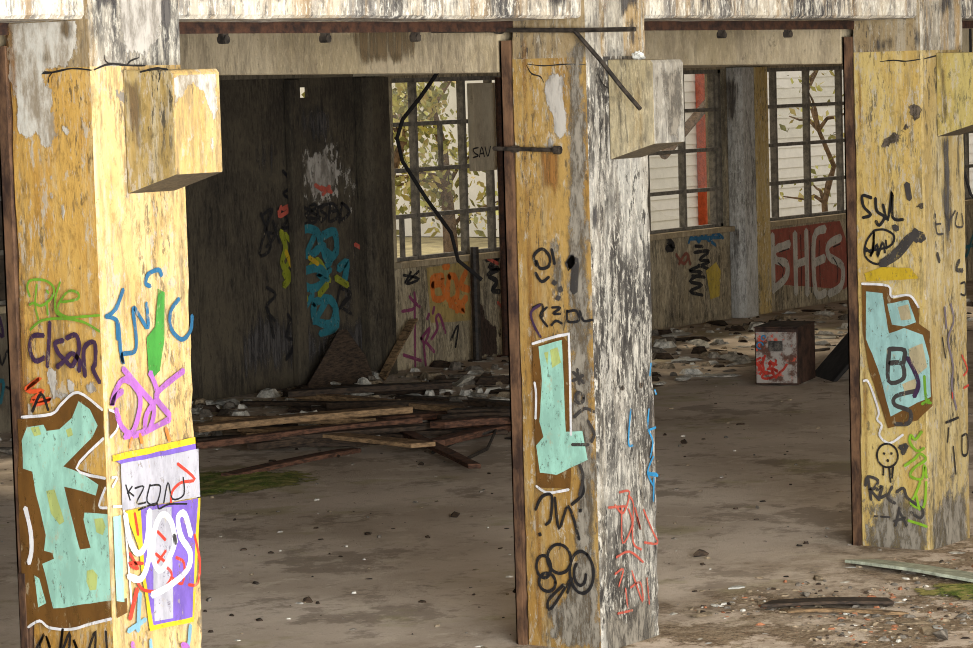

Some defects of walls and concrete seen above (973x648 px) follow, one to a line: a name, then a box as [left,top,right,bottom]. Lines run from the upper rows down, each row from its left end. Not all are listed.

peeling [7,21,77,148]
peeling [174,74,218,120]
peeling [545,74,570,148]
damp [542,42,655,648]